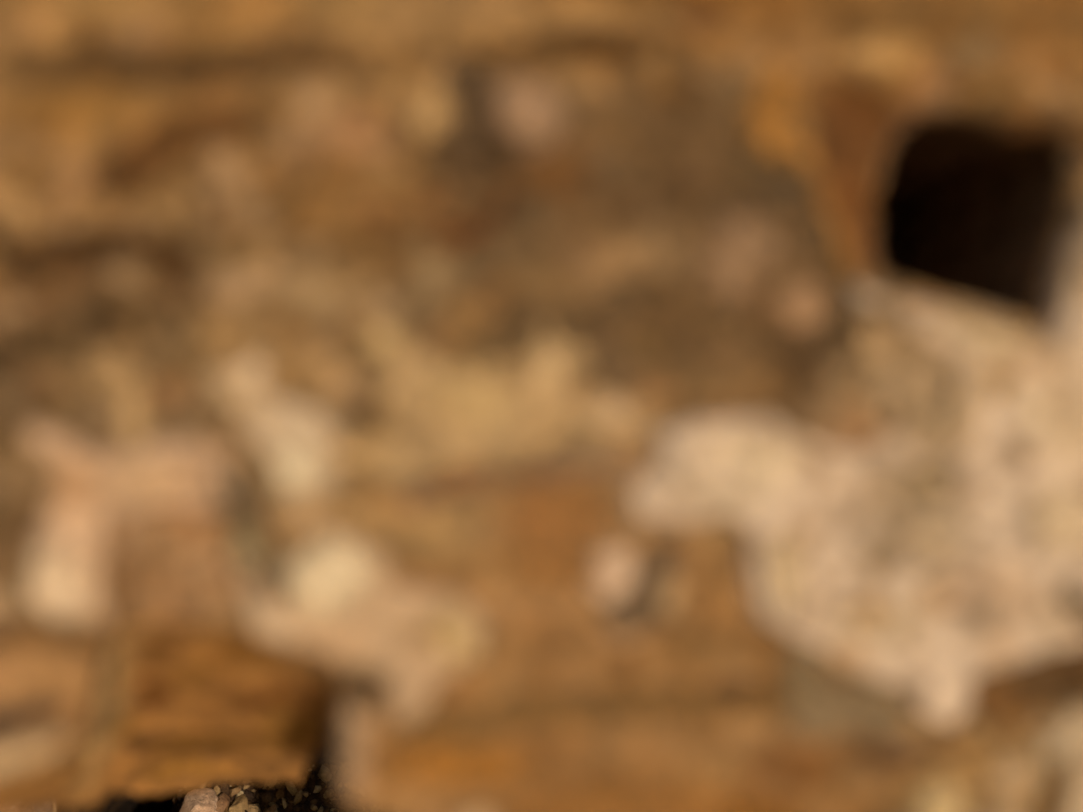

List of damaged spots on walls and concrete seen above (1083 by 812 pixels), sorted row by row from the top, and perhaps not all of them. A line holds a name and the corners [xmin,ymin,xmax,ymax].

spalling [0,179,45,234]
spalling [413,78,446,141]
flaking render [23,422,234,625]
flaking render [204,203,1083,725]